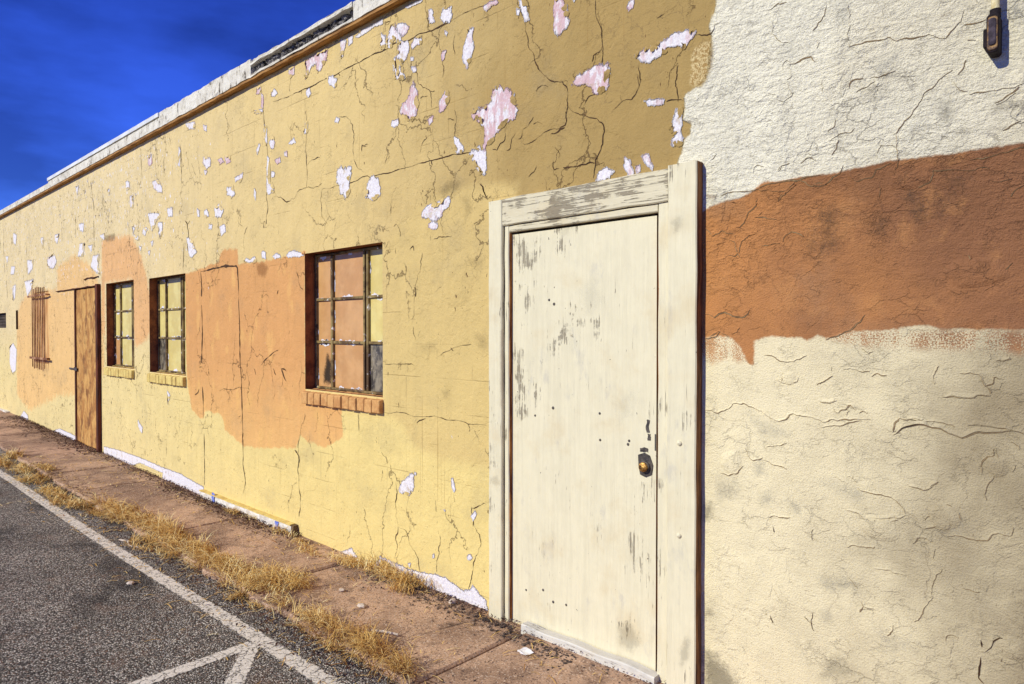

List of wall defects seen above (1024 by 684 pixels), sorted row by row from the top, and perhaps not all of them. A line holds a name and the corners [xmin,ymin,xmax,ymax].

peeling [552,0,575,37]
peeling [462,27,474,70]
peeling [634,27,696,64]
spalling [250,0,452,201]
peeling [453,84,518,176]
peeling [571,61,611,95]
peeling [643,98,684,147]
peeling [595,153,653,181]
crack [183,1,641,492]
peeling [104,446,204,495]
peeling [372,556,488,611]
crack [978,637,1003,684]